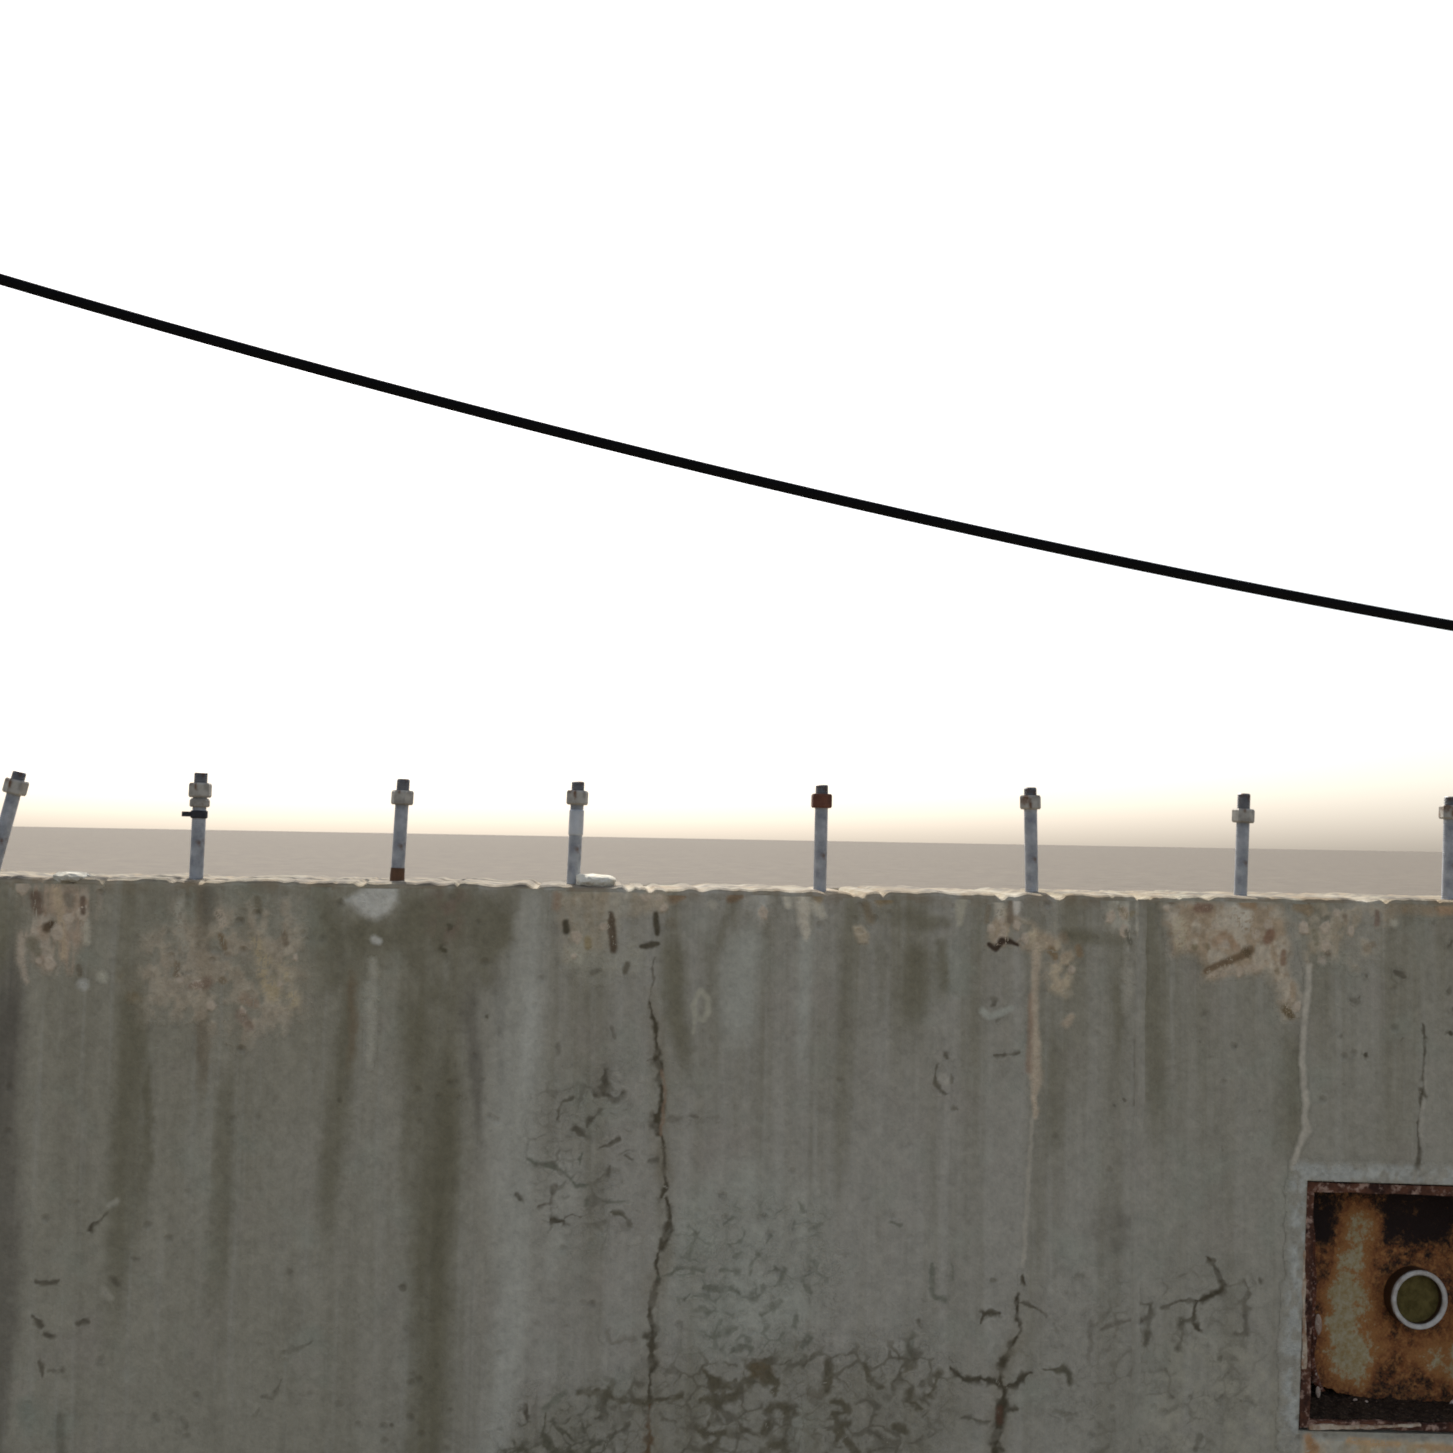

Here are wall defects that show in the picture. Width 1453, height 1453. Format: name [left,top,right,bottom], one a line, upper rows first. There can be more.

water stain [0,884,79,1453]
water stain [92,954,160,1384]
spalling [12,872,321,1057]
water stain [189,1030,243,1356]
crack [482,955,1280,1453]
spalling [950,899,1086,1121]
spalling [1100,900,1453,1025]